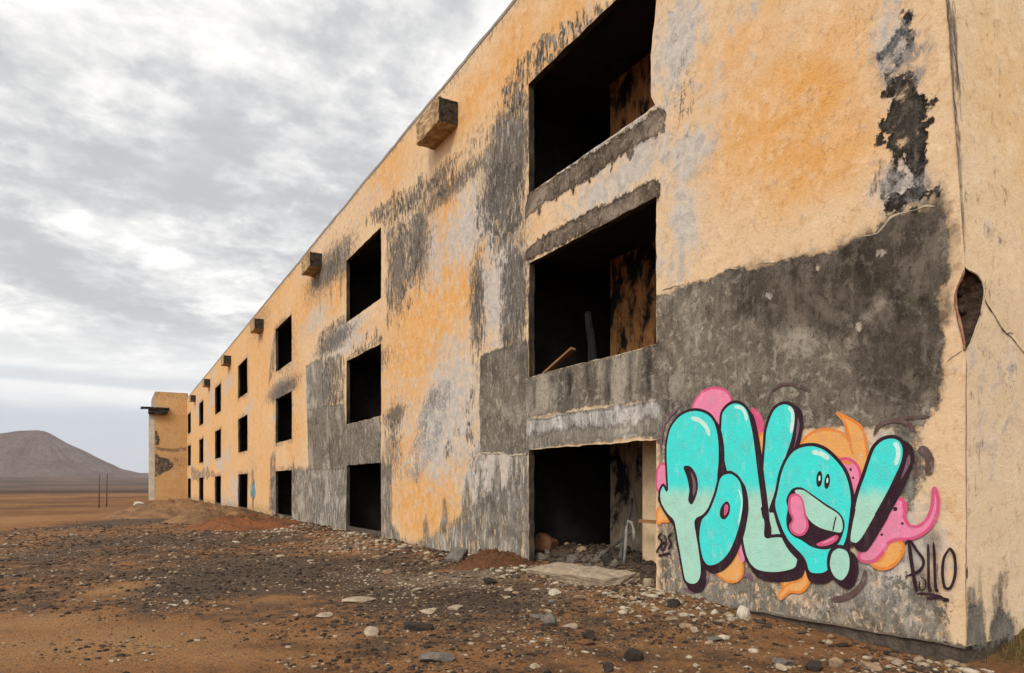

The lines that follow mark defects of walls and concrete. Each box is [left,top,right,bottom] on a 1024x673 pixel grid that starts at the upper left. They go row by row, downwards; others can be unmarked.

leakage [318,317,388,417]
leakage [386,227,395,320]
leakage [470,266,486,377]
flaking render [445,0,985,457]
crack [985,299,1024,352]
leakage [291,462,347,529]